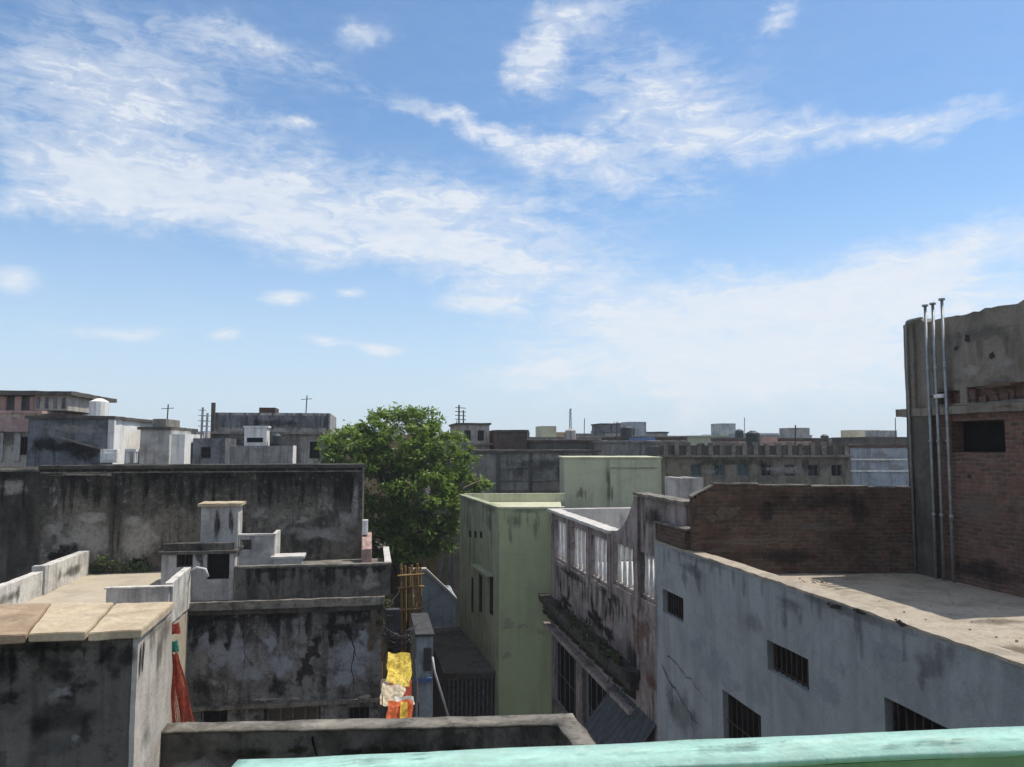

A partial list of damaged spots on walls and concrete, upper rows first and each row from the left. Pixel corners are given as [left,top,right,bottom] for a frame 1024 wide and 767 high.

leakage [1,472,32,527]
leakage [51,472,240,536]
leakage [255,472,358,541]
leakage [48,543,78,574]
leakage [0,643,94,739]
leakage [98,646,133,676]
peeling [199,629,376,701]
crack [350,635,358,694]
crack [662,656,711,723]